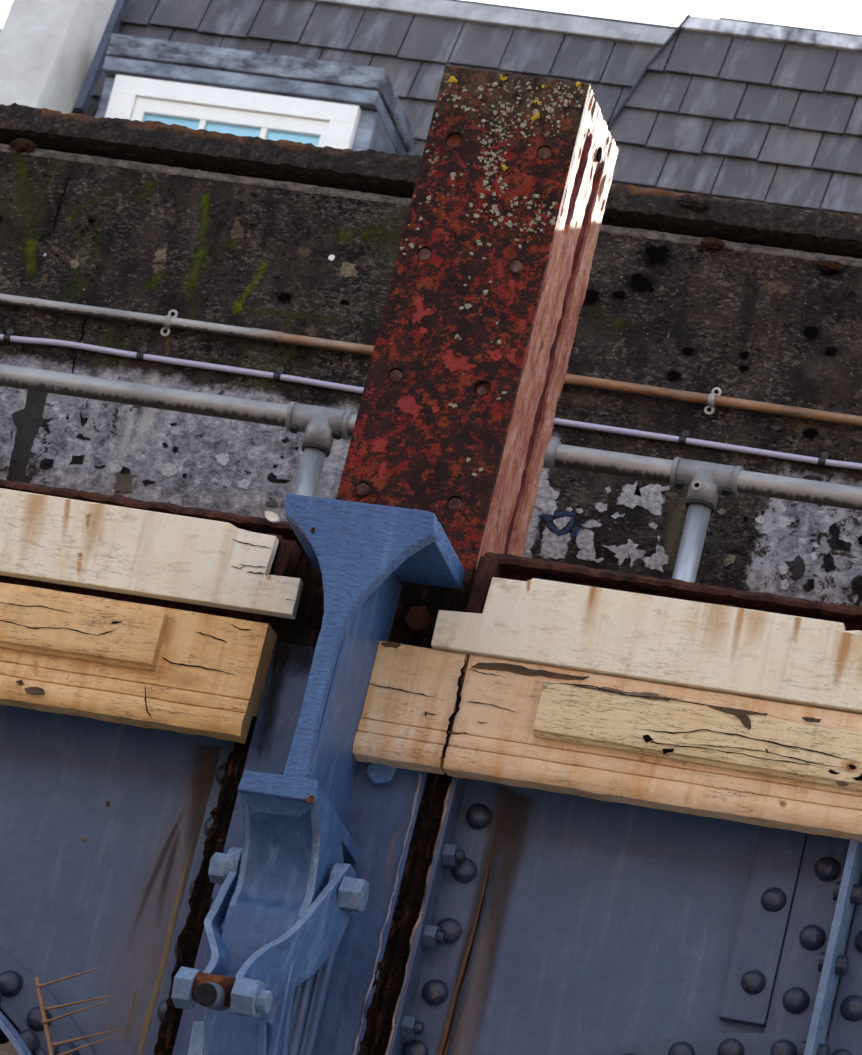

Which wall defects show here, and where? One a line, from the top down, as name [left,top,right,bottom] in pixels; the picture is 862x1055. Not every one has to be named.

peeling [7,390,54,482]
spalling [69,442,187,493]
peeling [215,454,229,466]
peeling [267,437,299,483]
peeling [524,478,670,573]
peeling [706,508,765,566]
peeling [778,523,862,592]
peeling [850,575,862,606]
crack [371,654,518,762]
rust [191,746,220,855]
rust [142,826,177,905]
rust [439,790,529,1055]